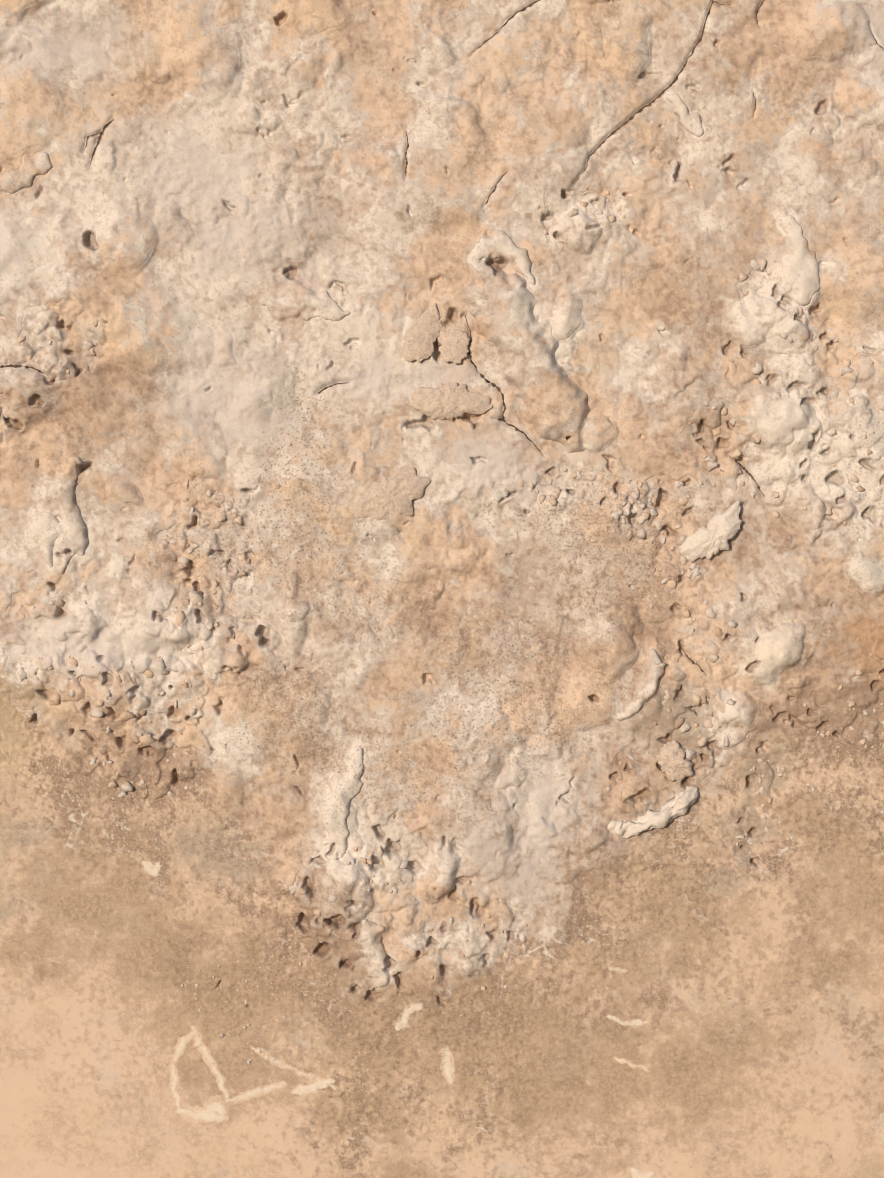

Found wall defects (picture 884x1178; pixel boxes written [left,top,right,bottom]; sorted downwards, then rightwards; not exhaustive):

crack [470,0,540,56]
crack [573,0,765,186]
water stain [832,0,884,101]
water stain [0,0,491,490]
crack [465,317,543,455]
water stain [431,419,598,529]
water stain [0,537,884,1178]